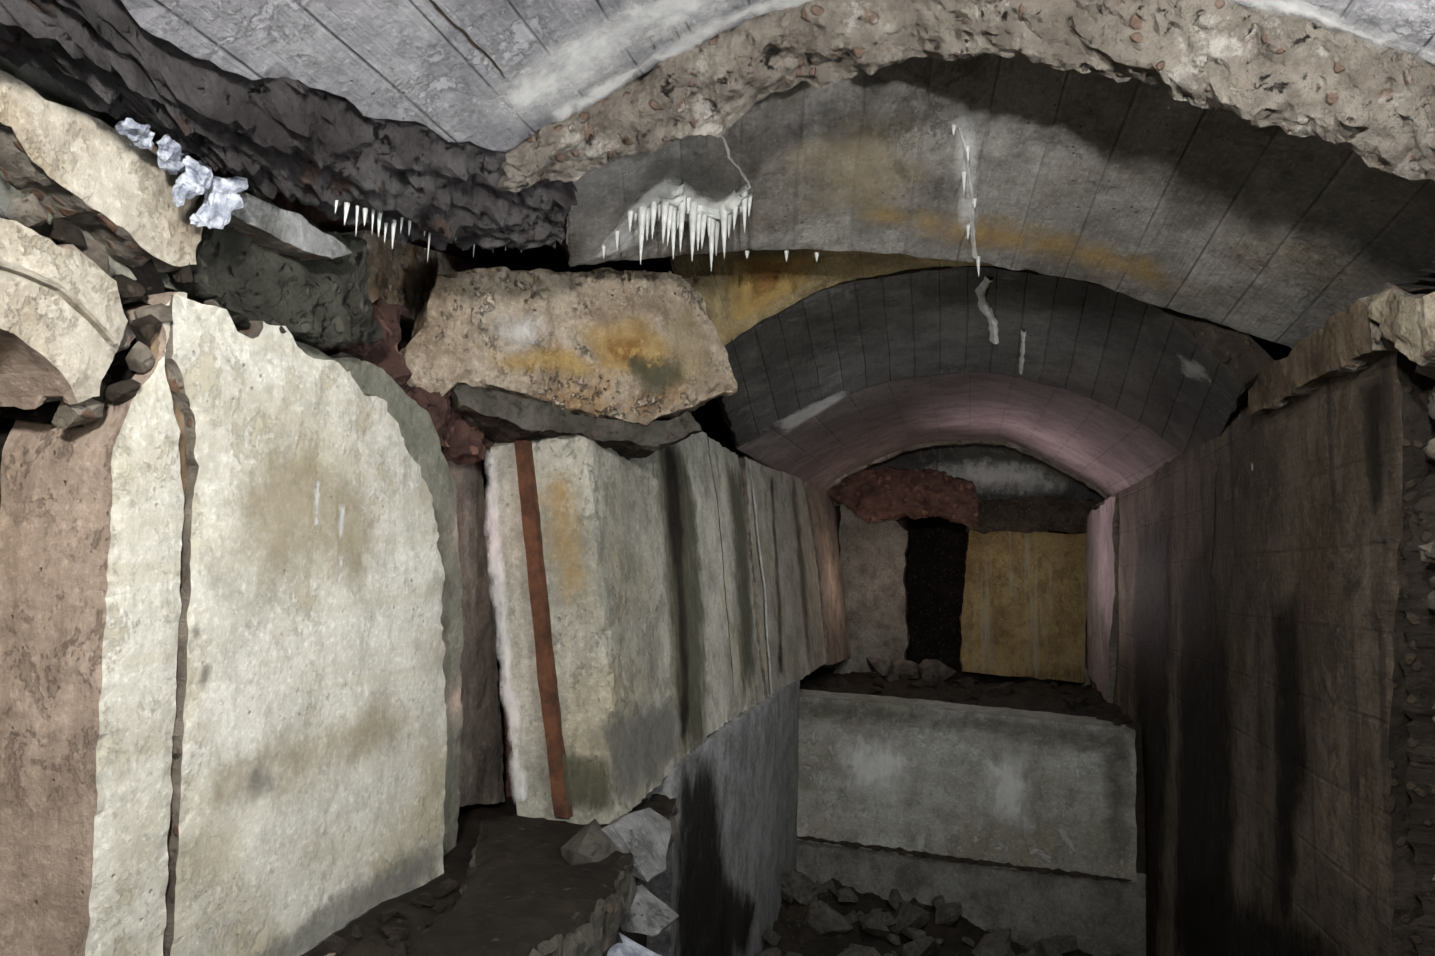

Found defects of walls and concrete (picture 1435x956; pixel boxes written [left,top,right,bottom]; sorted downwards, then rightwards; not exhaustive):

damp [335,200,431,262]
damp [597,164,754,271]
efflorescence [951,119,999,344]
crack [0,169,251,507]
damp [1363,379,1382,507]
corrosion [514,440,610,818]
damp [845,742,907,788]
damp [990,764,1024,816]
damp [1134,517,1337,956]